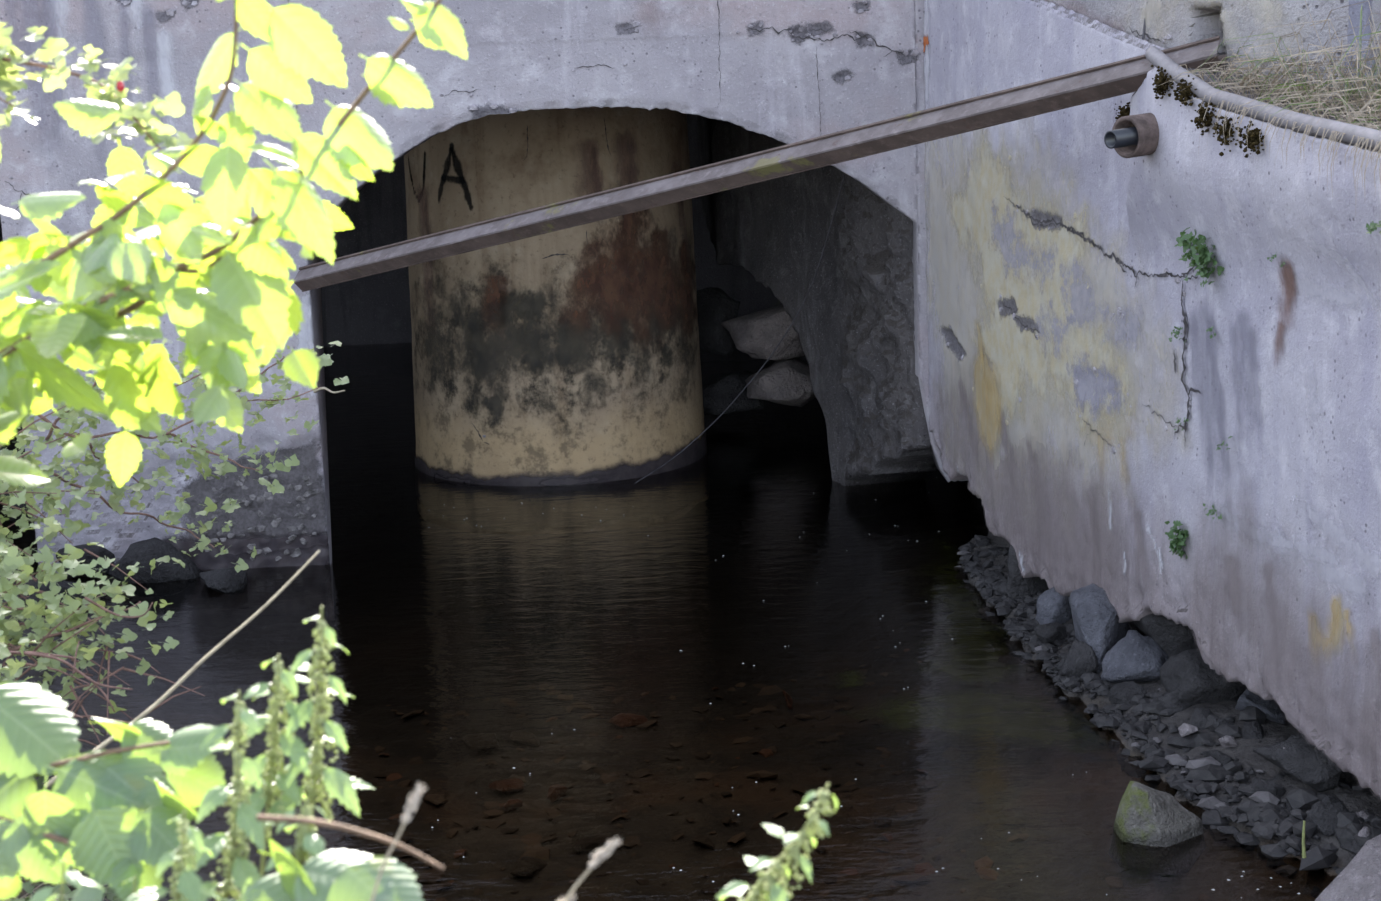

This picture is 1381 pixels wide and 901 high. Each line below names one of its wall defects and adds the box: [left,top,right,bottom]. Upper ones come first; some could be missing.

spalling [156,0,198,22]
spalling [748,21,764,36]
spalling [789,21,833,45]
spalling [854,0,869,13]
spalling [855,32,874,48]
spalling [898,49,921,86]
peeling [942,136,1132,432]
water stain [415,234,697,430]
crack [999,196,1201,441]
rust [1277,262,1294,347]